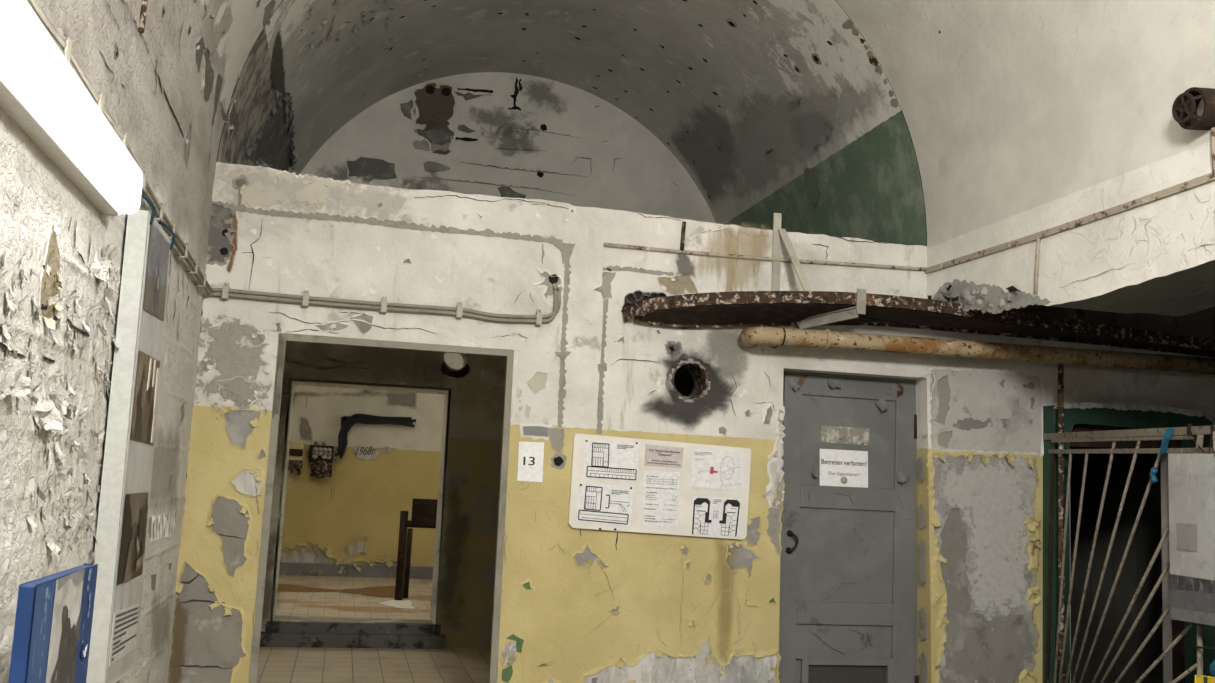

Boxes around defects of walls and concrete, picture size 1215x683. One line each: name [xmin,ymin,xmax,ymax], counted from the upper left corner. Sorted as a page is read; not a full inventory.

peeling [195,36,238,153]
leakage [402,174,434,190]
spalling [396,59,494,177]
leakage [479,111,532,153]
leakage [529,83,560,110]
leakage [733,87,880,207]
peeling [0,220,121,564]
leakage [677,327,746,377]
peeling [150,315,281,683]
peeling [895,366,1047,683]
peeling [498,634,524,683]
peeling [576,617,782,683]